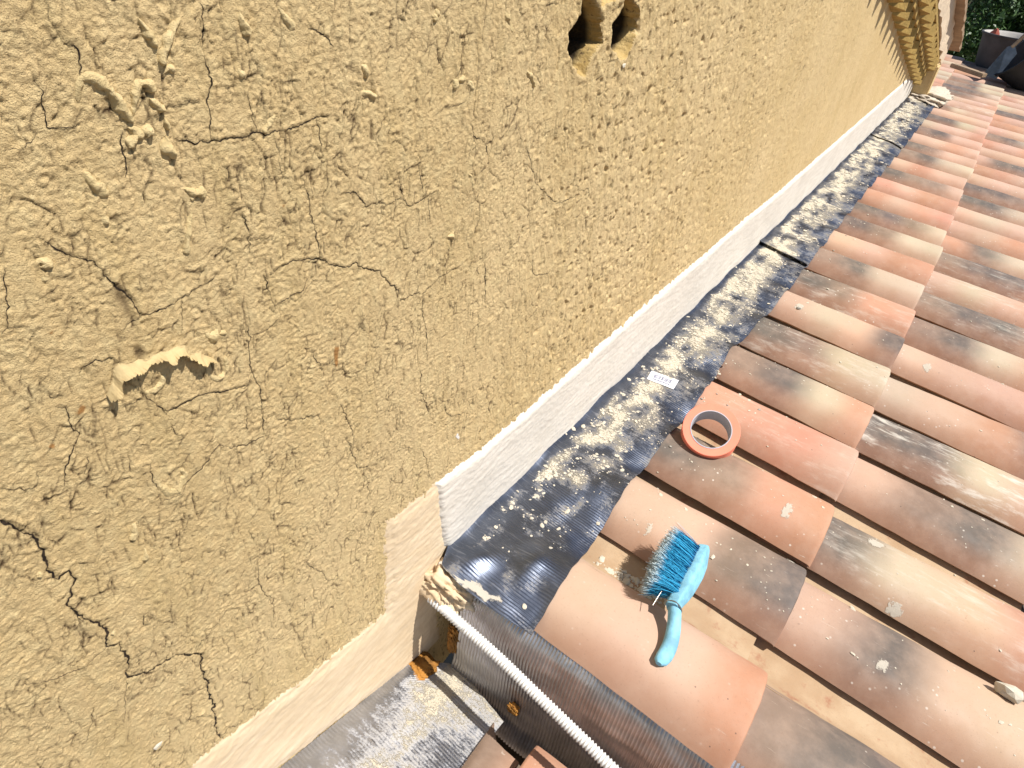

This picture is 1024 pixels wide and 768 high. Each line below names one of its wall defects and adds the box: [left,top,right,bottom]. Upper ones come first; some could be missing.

crack [48,4,82,72]
crack [11,77,79,150]
crack [2,269,16,333]
crack [45,241,214,332]
crack [119,4,486,503]
peeling [106,345,217,402]
crack [49,395,89,485]
crack [0,520,236,738]